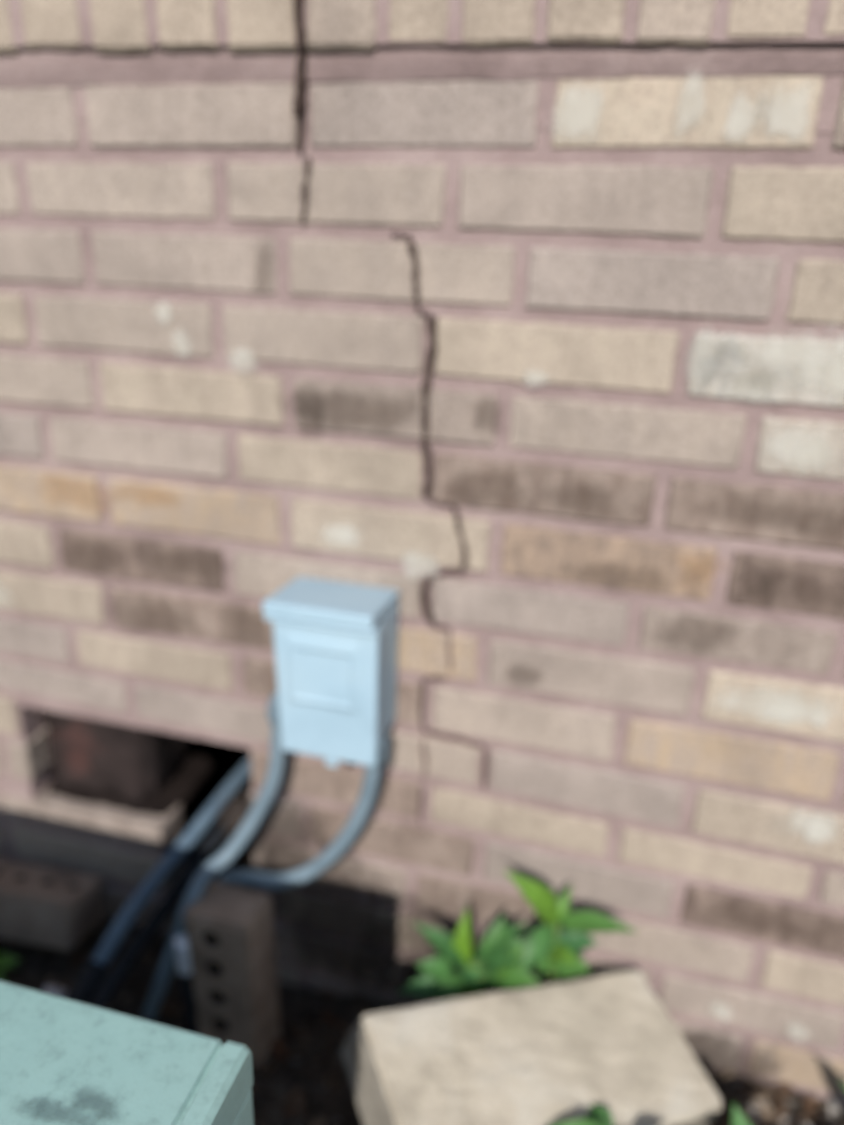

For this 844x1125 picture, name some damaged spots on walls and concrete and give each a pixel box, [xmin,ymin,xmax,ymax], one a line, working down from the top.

crack [293,0,312,224]
crack [392,233,489,826]